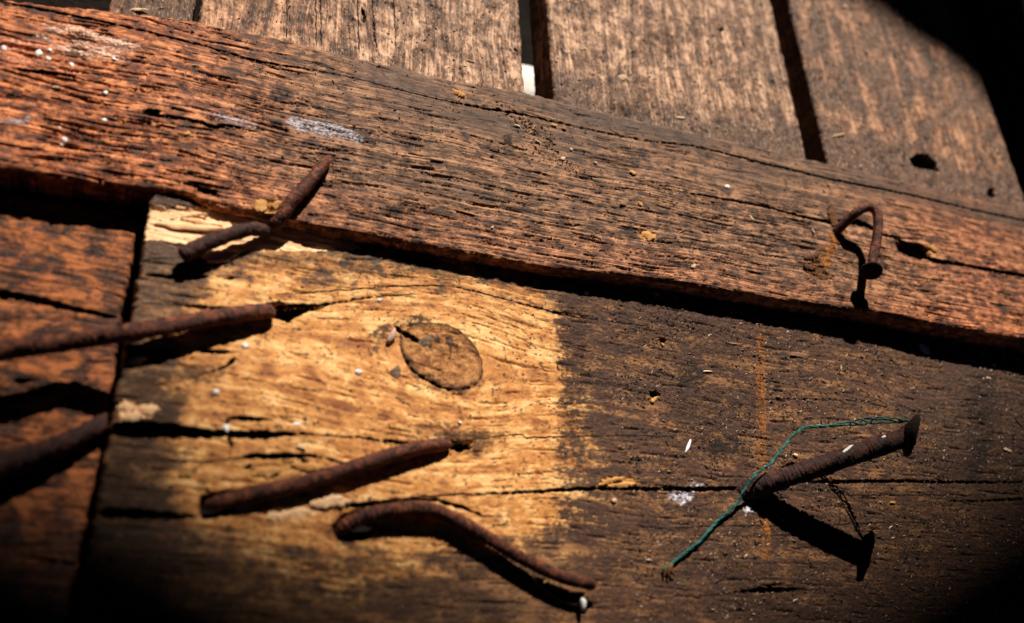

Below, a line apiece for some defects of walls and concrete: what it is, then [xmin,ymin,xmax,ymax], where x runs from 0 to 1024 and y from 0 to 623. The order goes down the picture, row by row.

corrosion [813,231,846,278]
crack [112,416,409,471]
crack [451,434,671,444]
crack [344,486,736,526]
crack [670,479,1024,528]